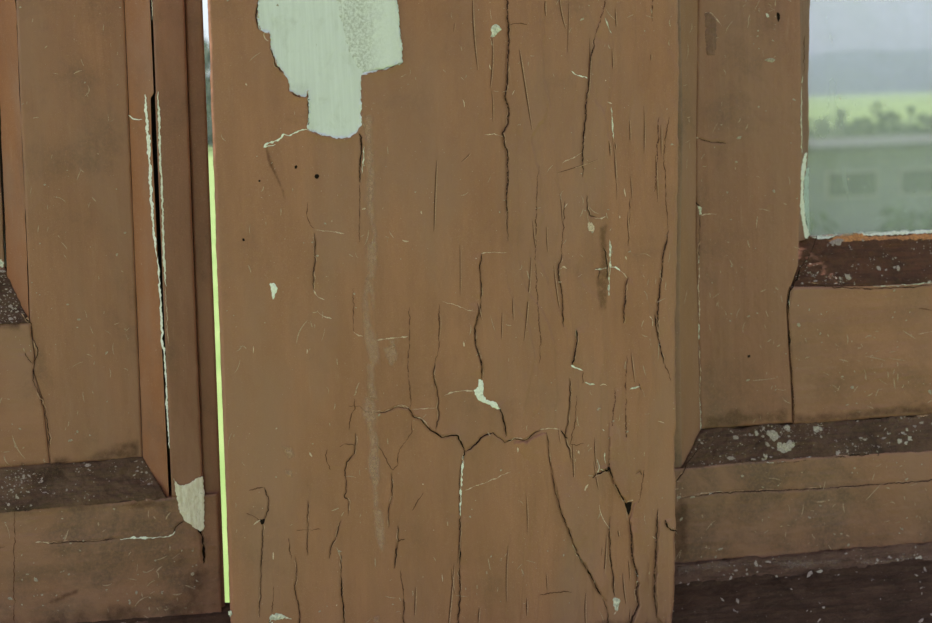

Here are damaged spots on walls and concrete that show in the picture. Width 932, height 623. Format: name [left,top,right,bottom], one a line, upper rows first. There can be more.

peeling [255,0,403,148]
peeling [800,37,837,239]
crack [22,314,52,459]
crack [288,0,676,623]
peeling [474,379,500,409]
crack [676,203,932,497]
peeling [175,476,205,531]
crack [246,487,269,617]